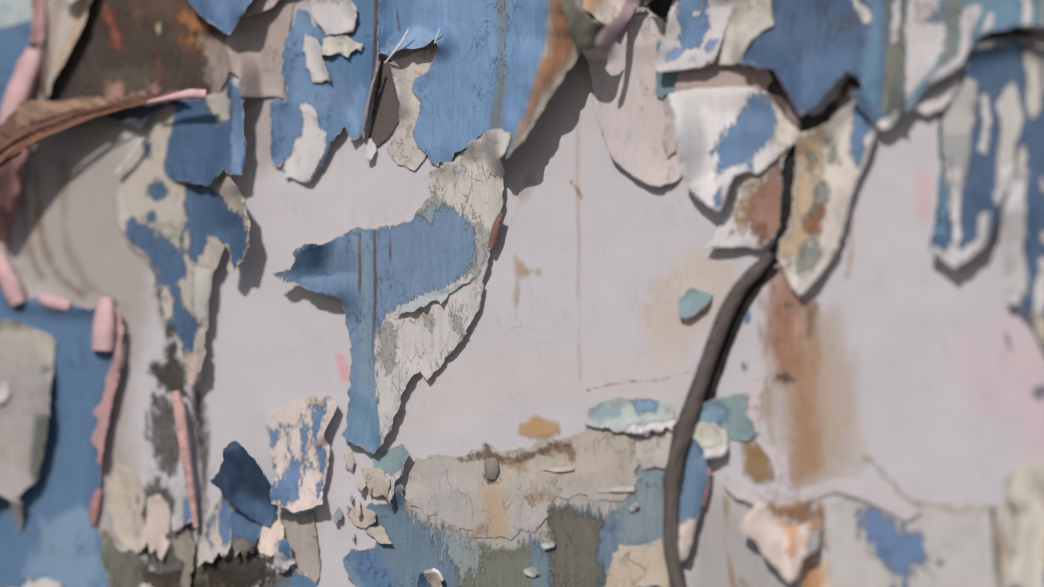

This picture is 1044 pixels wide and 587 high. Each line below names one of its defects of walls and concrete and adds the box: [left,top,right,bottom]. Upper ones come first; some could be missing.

corrosion [522,0,572,126]
peeling [581,0,1044,346]
peeling [0,0,677,587]
corrosion [743,442,774,483]
corrosion [768,268,842,474]
peeling [679,373,1044,587]